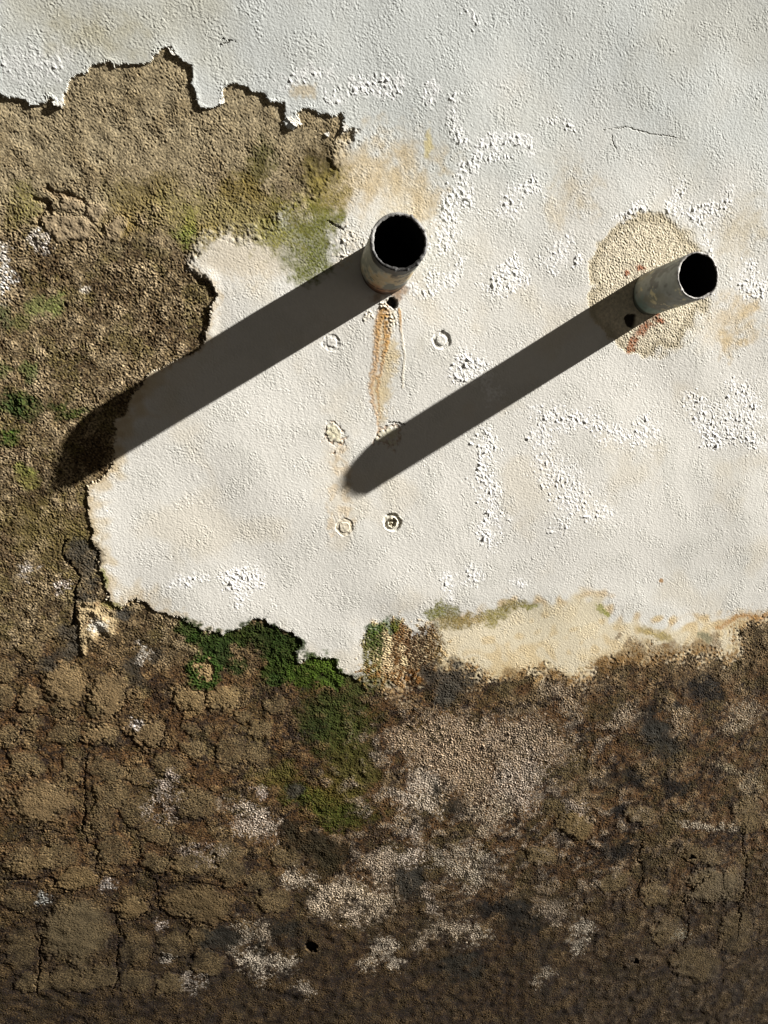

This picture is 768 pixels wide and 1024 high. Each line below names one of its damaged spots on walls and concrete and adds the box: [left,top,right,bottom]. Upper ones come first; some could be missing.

damp [271,58,768,362]
peeling [0,47,354,522]
rust [368,285,409,425]
rust [627,313,665,355]
peeling [587,211,710,360]
damp [354,589,768,711]
peeling [0,509,768,1024]
crack [0,691,249,999]
crack [621,833,645,919]
crack [681,878,705,953]
crack [735,825,749,939]